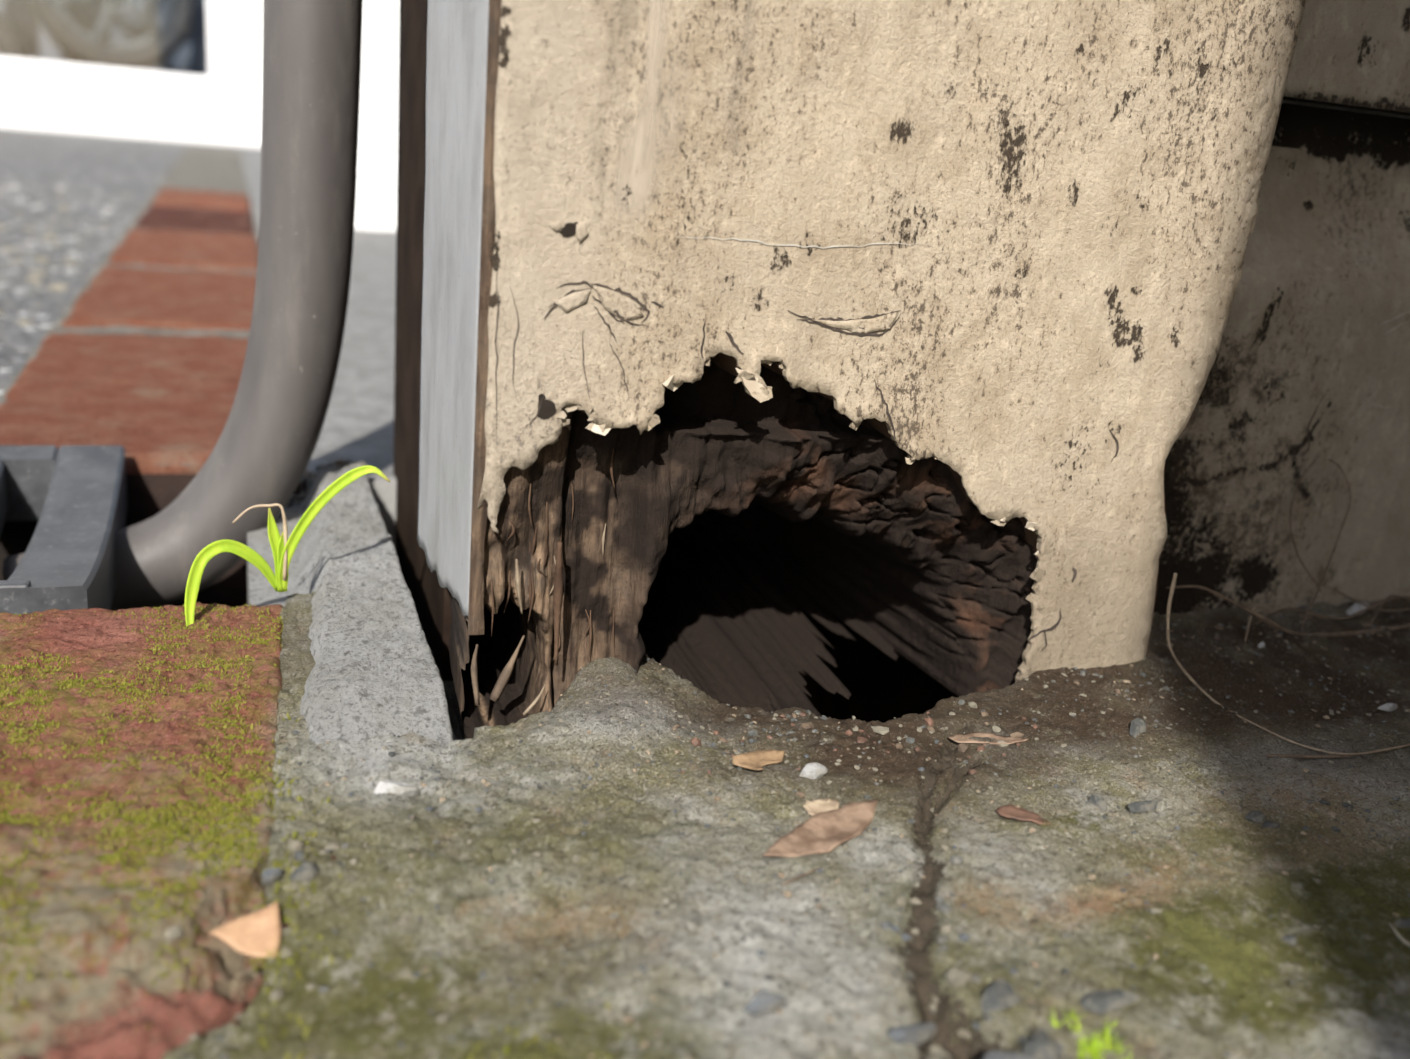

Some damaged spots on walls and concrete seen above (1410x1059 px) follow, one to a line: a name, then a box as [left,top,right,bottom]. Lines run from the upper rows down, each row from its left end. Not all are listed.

leakage [1096,285,1145,367]
peeling [662,375,684,391]
peeling [734,360,784,403]
peeling [538,394,611,436]
peeling [644,413,660,431]
leakage [1154,289,1331,616]
peeling [1025,550,1046,603]
crack [895,724,1019,1059]